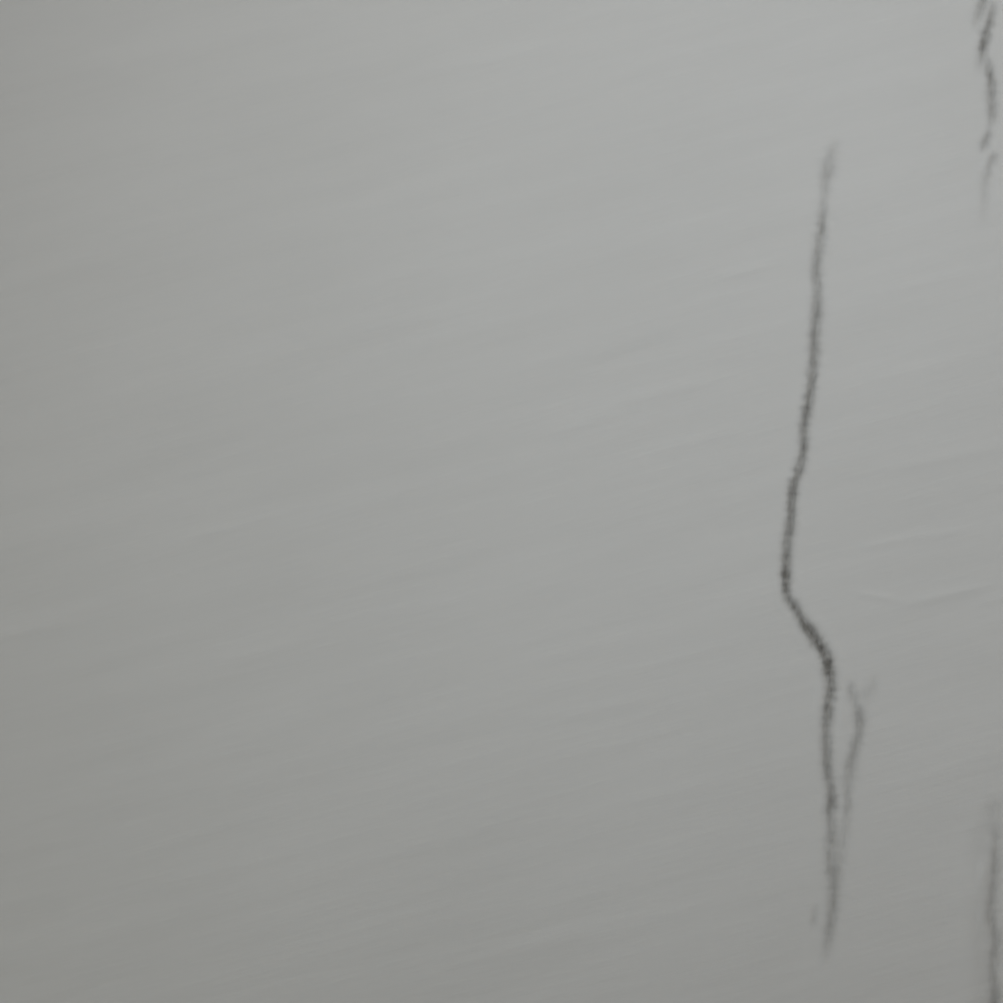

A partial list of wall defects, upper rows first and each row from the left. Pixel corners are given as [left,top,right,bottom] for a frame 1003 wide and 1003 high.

crack [783,570,831,674]